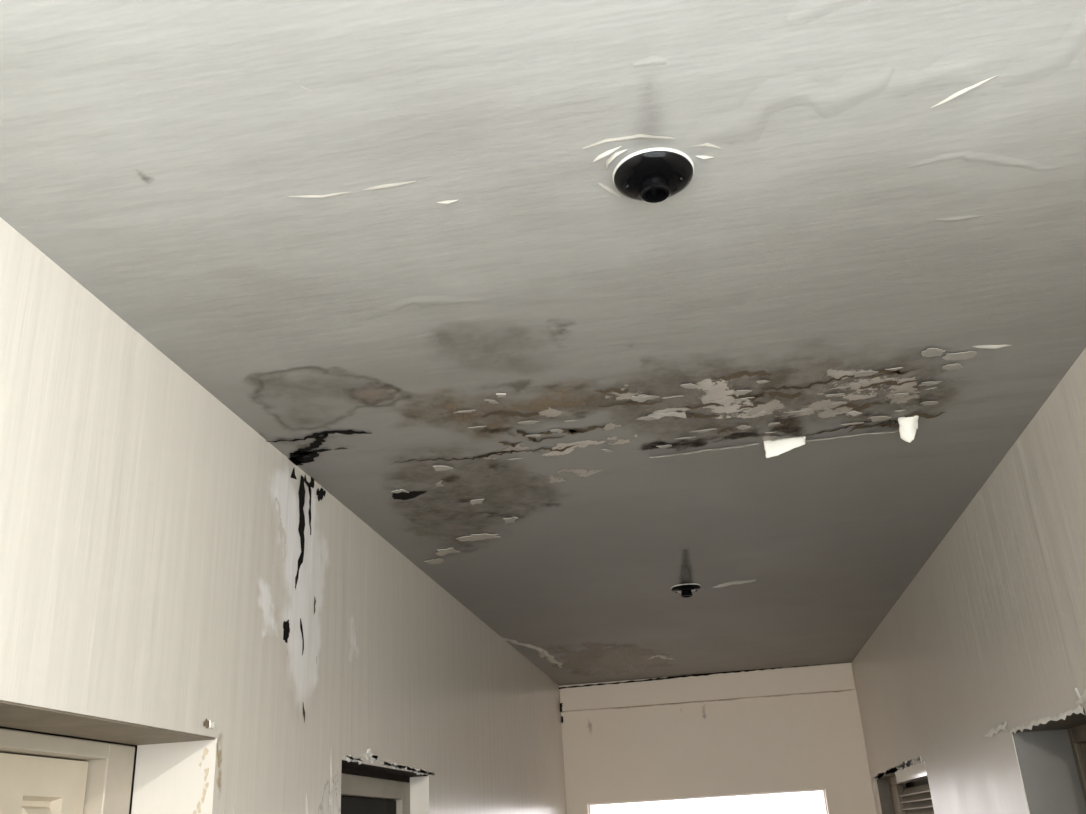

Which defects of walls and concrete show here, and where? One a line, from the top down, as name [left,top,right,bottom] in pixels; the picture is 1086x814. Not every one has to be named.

crack [267,430,371,664]
leakage [409,390,619,442]
peeling [391,345,1011,564]